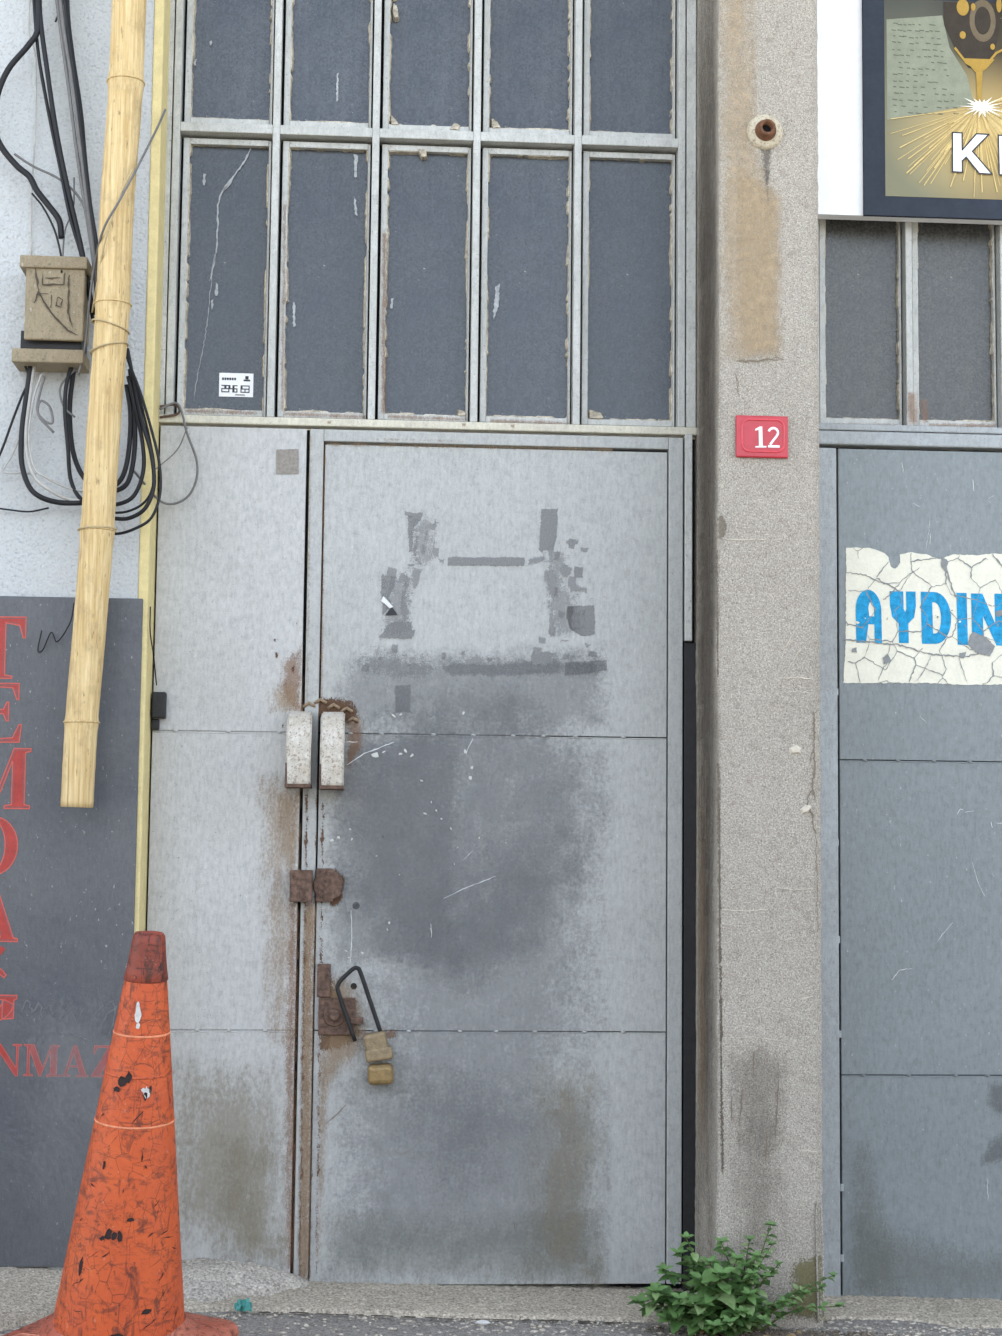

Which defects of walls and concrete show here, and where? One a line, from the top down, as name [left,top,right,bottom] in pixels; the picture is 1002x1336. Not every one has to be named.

rust [763,149,771,201]
peeling [361,509,607,697]
rust [274,639,302,711]
rust [318,697,359,759]
peeling [392,685,411,717]
rust [285,763,360,1279]